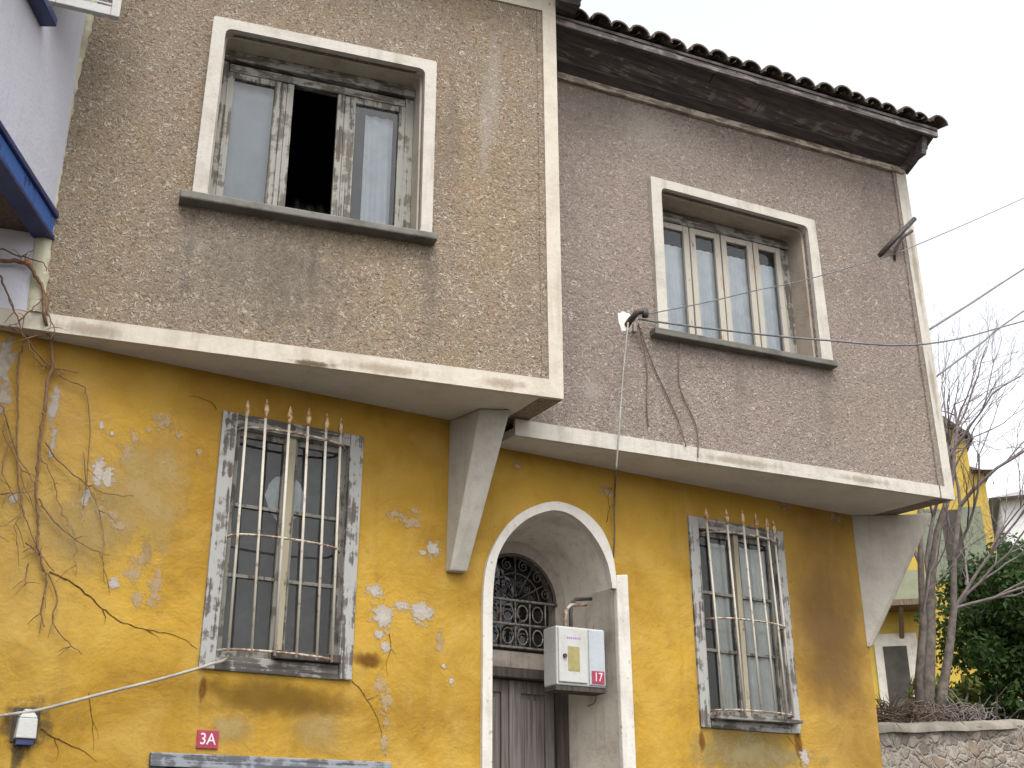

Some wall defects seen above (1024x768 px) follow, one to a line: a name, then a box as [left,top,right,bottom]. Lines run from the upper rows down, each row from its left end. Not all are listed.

peeling [0,337,15,414]
peeling [48,387,60,457]
flaking render [80,413,182,530]
peeling [108,543,161,607]
peeling [390,509,420,527]
peeling [419,541,442,561]
flaking render [365,584,454,684]
peeling [374,678,393,753]